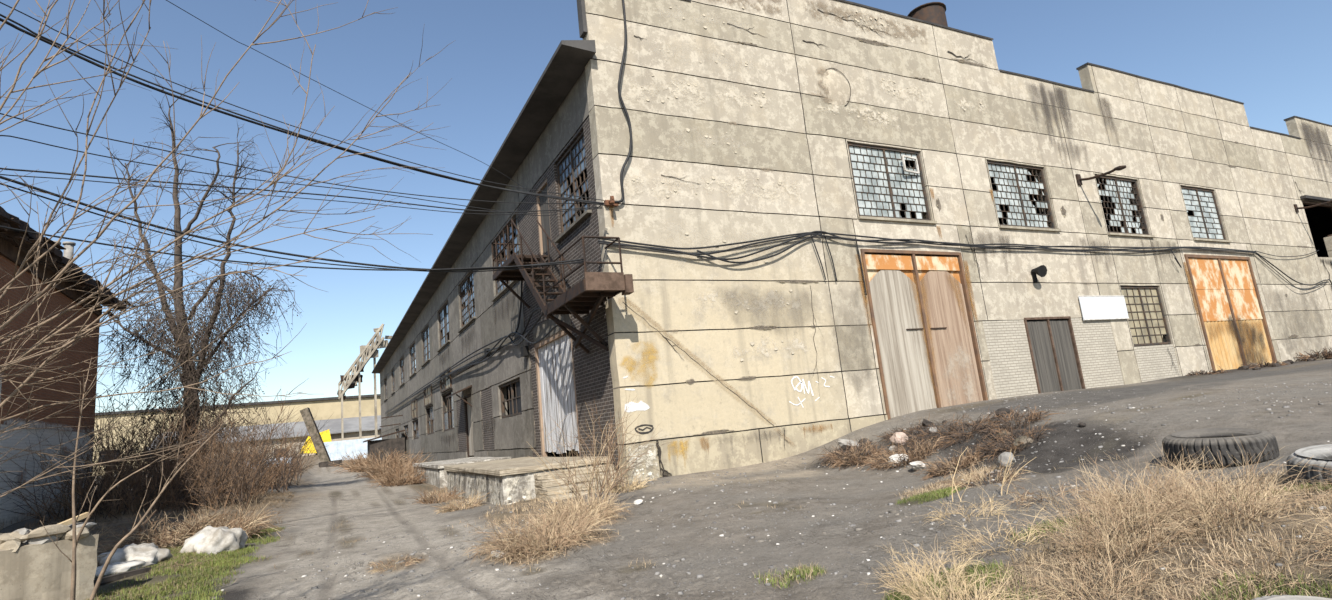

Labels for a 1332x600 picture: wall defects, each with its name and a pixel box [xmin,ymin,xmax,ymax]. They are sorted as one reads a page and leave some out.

peeling [626,75,703,104]
peeling [686,91,767,153]
damp [1042,85,1069,135]